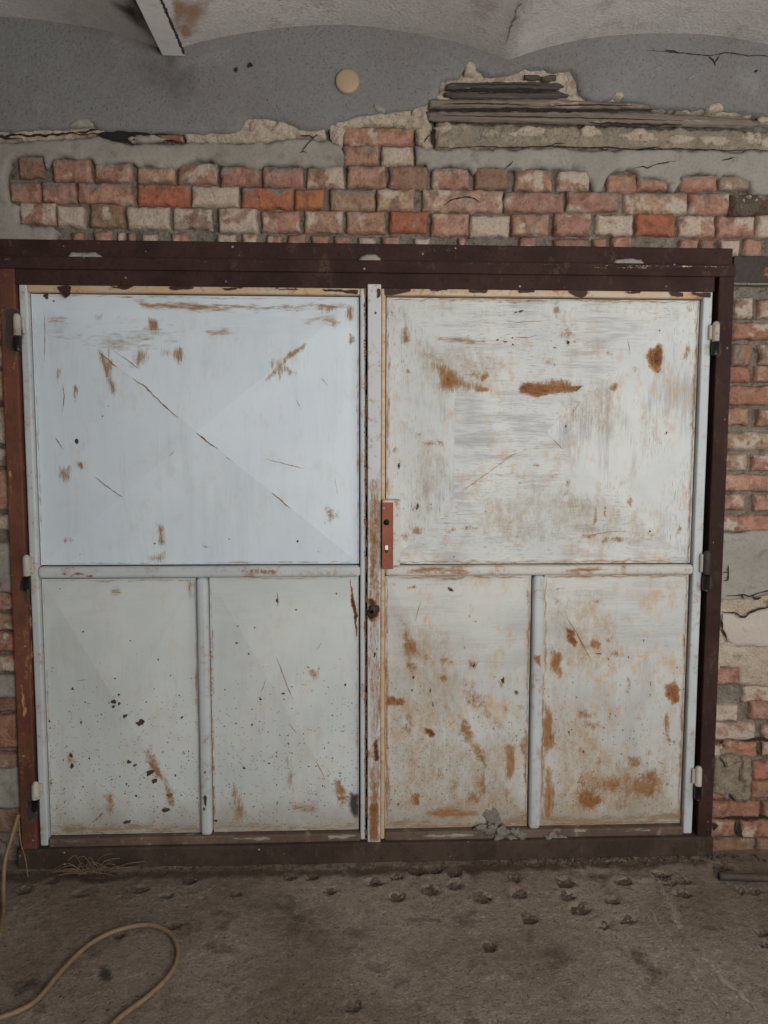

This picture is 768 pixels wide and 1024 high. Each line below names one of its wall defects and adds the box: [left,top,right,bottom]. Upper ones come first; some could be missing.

crack [647,50,768,66]
flaking render [0,70,768,153]
flaking render [728,194,764,217]
crack [721,565,768,643]
flaking render [720,609,768,647]